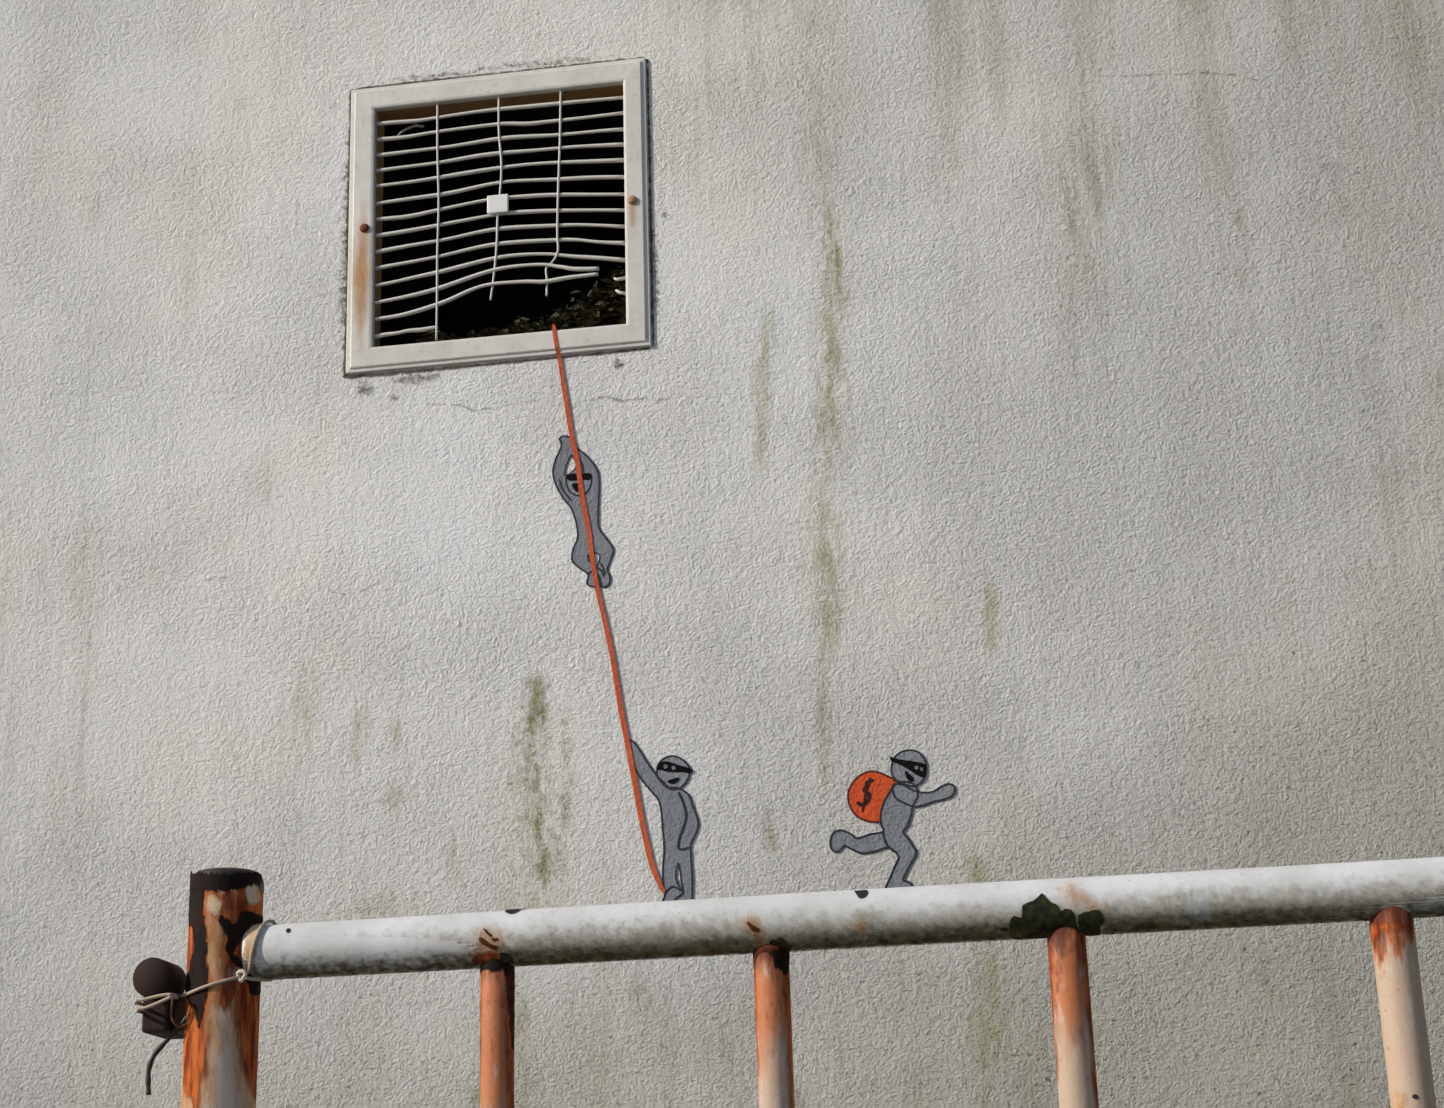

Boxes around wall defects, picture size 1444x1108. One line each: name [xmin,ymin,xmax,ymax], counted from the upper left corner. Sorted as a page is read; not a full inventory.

corrosion [355,243,367,312]
corrosion [180,883,264,1108]